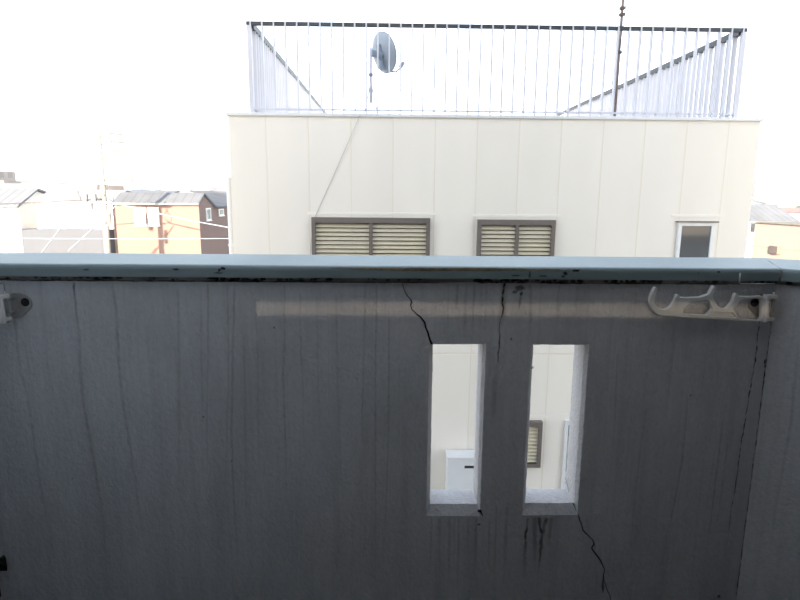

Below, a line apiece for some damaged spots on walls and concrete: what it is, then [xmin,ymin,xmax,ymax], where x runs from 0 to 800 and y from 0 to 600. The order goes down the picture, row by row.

crack [402,284,433,344]
crack [565,477,611,600]